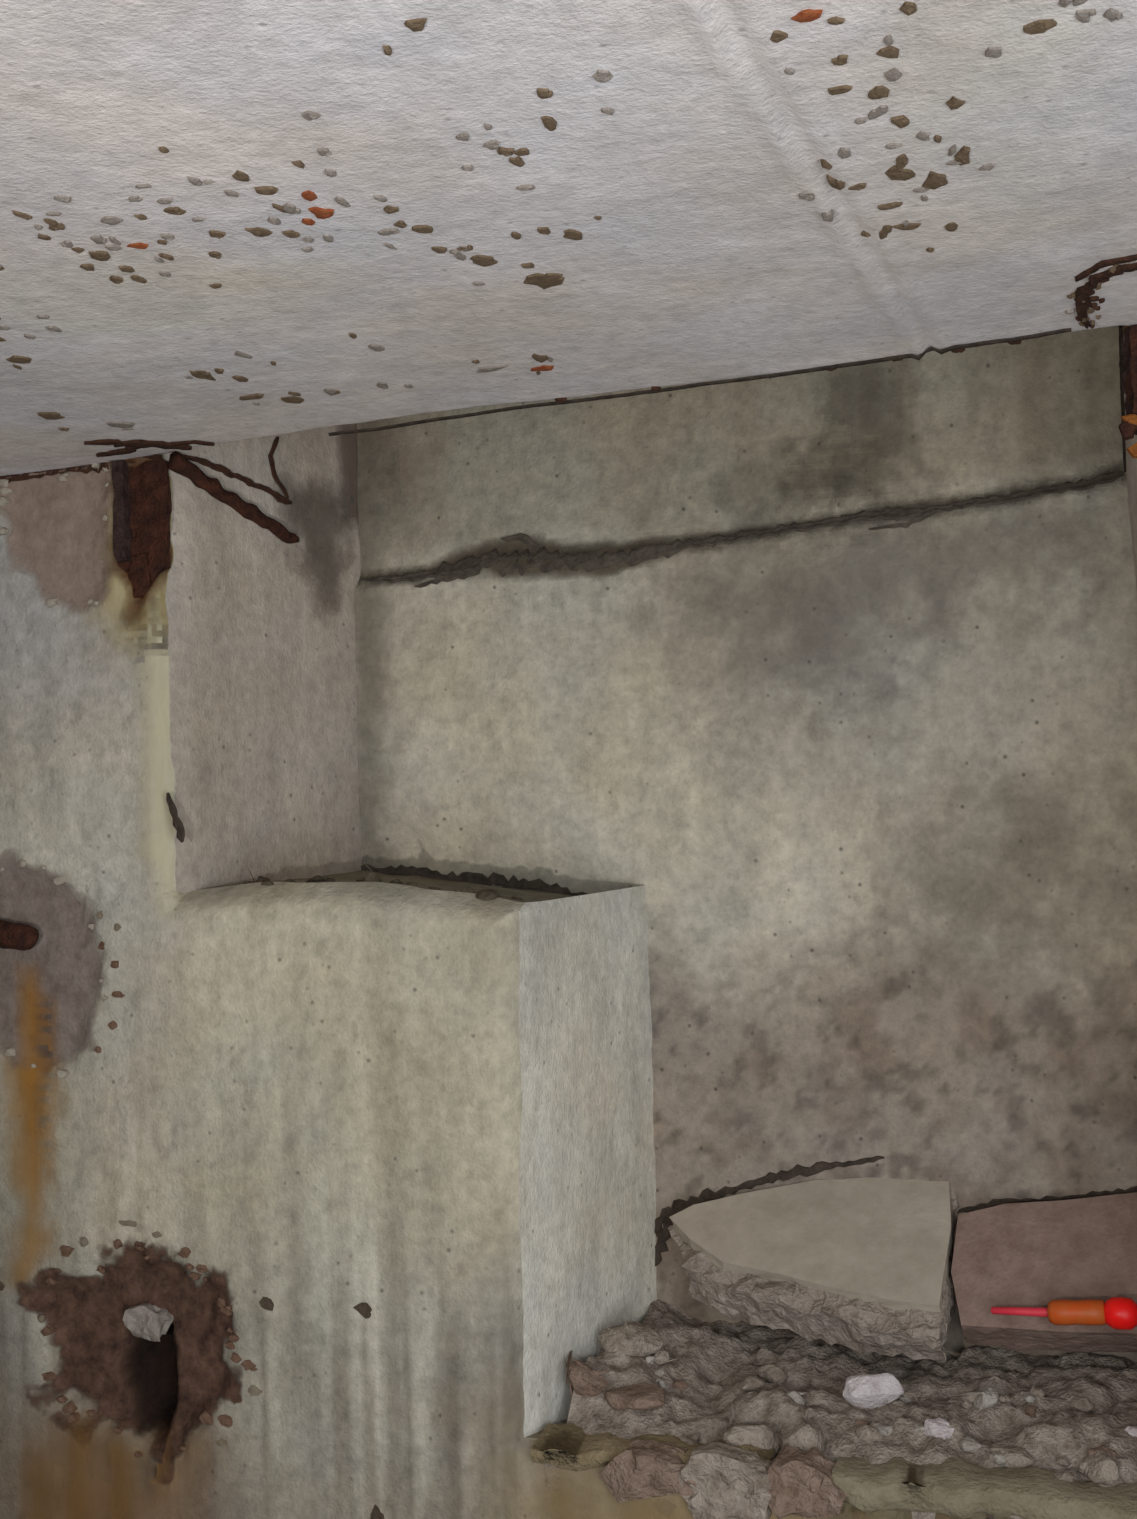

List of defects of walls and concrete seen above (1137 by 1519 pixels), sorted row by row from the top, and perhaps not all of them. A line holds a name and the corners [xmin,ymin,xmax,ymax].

peeling [770,9,845,43]
peeling [828,34,996,239]
peeling [12,183,226,284]
peeling [188,170,351,253]
crack [359,254,1137,588]
rust [1118,324,1137,459]
spalling [0,463,115,611]
rust [105,452,300,632]
crack [361,864,587,896]
spalling [0,852,125,1079]
crack [655,1156,884,1266]
spalling [0,1220,263,1483]